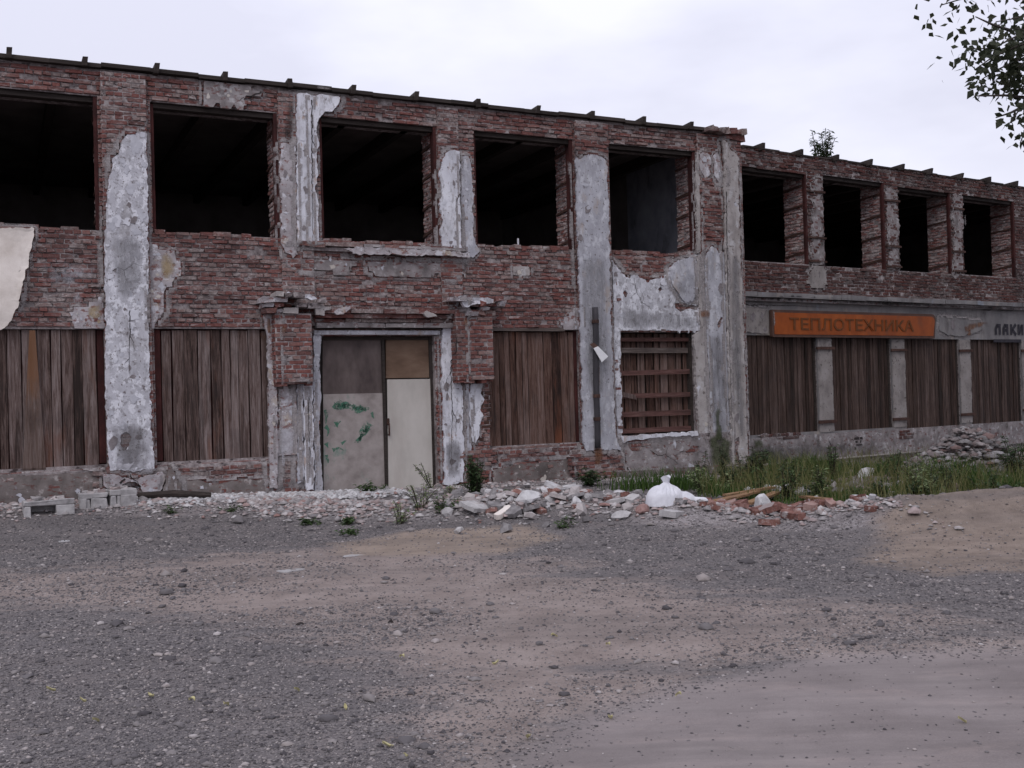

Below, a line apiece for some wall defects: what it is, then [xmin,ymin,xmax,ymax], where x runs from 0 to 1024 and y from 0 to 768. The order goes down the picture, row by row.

flaking render [0,86,803,517]